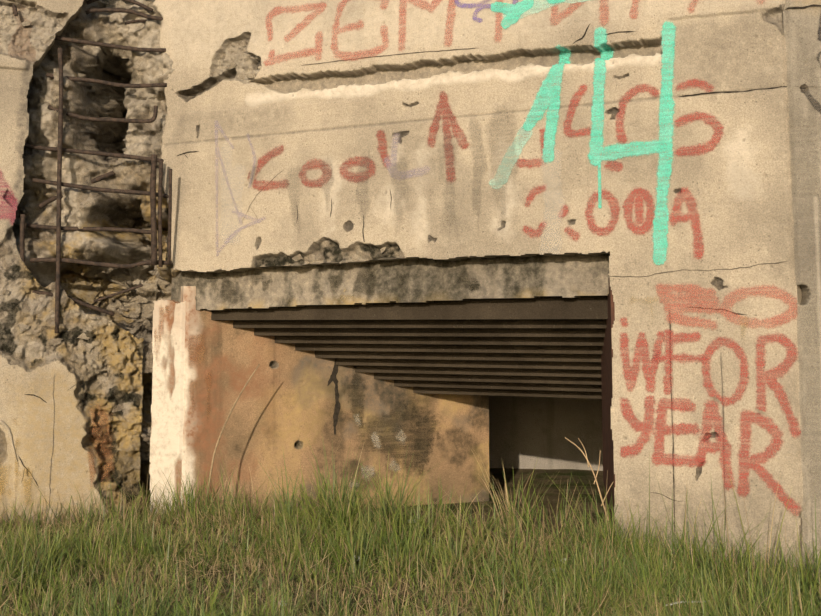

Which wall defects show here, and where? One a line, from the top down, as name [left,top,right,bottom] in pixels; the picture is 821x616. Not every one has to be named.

spalling [0,0,262,522]
spalling [250,237,405,268]
crack [328,360,341,435]